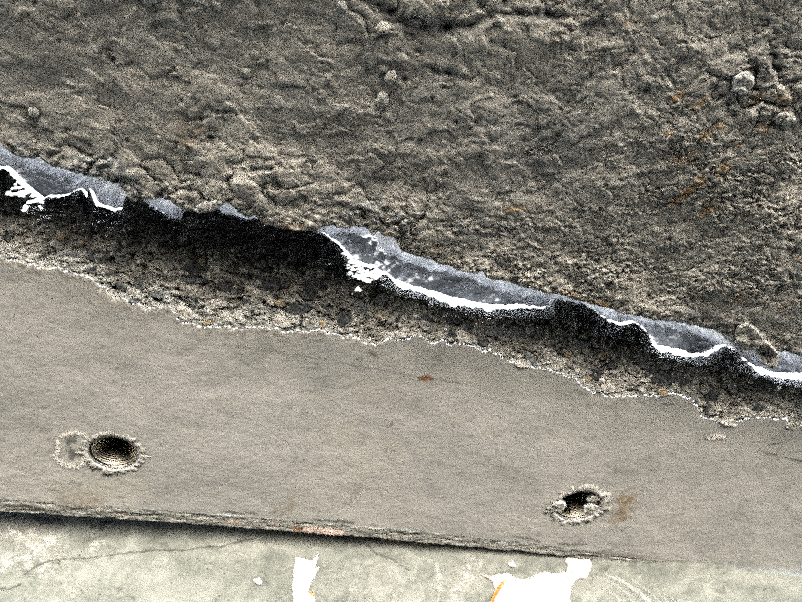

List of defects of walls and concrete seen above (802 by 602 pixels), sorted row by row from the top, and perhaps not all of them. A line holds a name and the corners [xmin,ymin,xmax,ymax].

crack [0,143,185,220]
crack [219,203,257,219]
spalling [0,151,802,442]
crack [319,225,802,373]
peeling [292,552,319,602]
peeling [481,556,592,602]